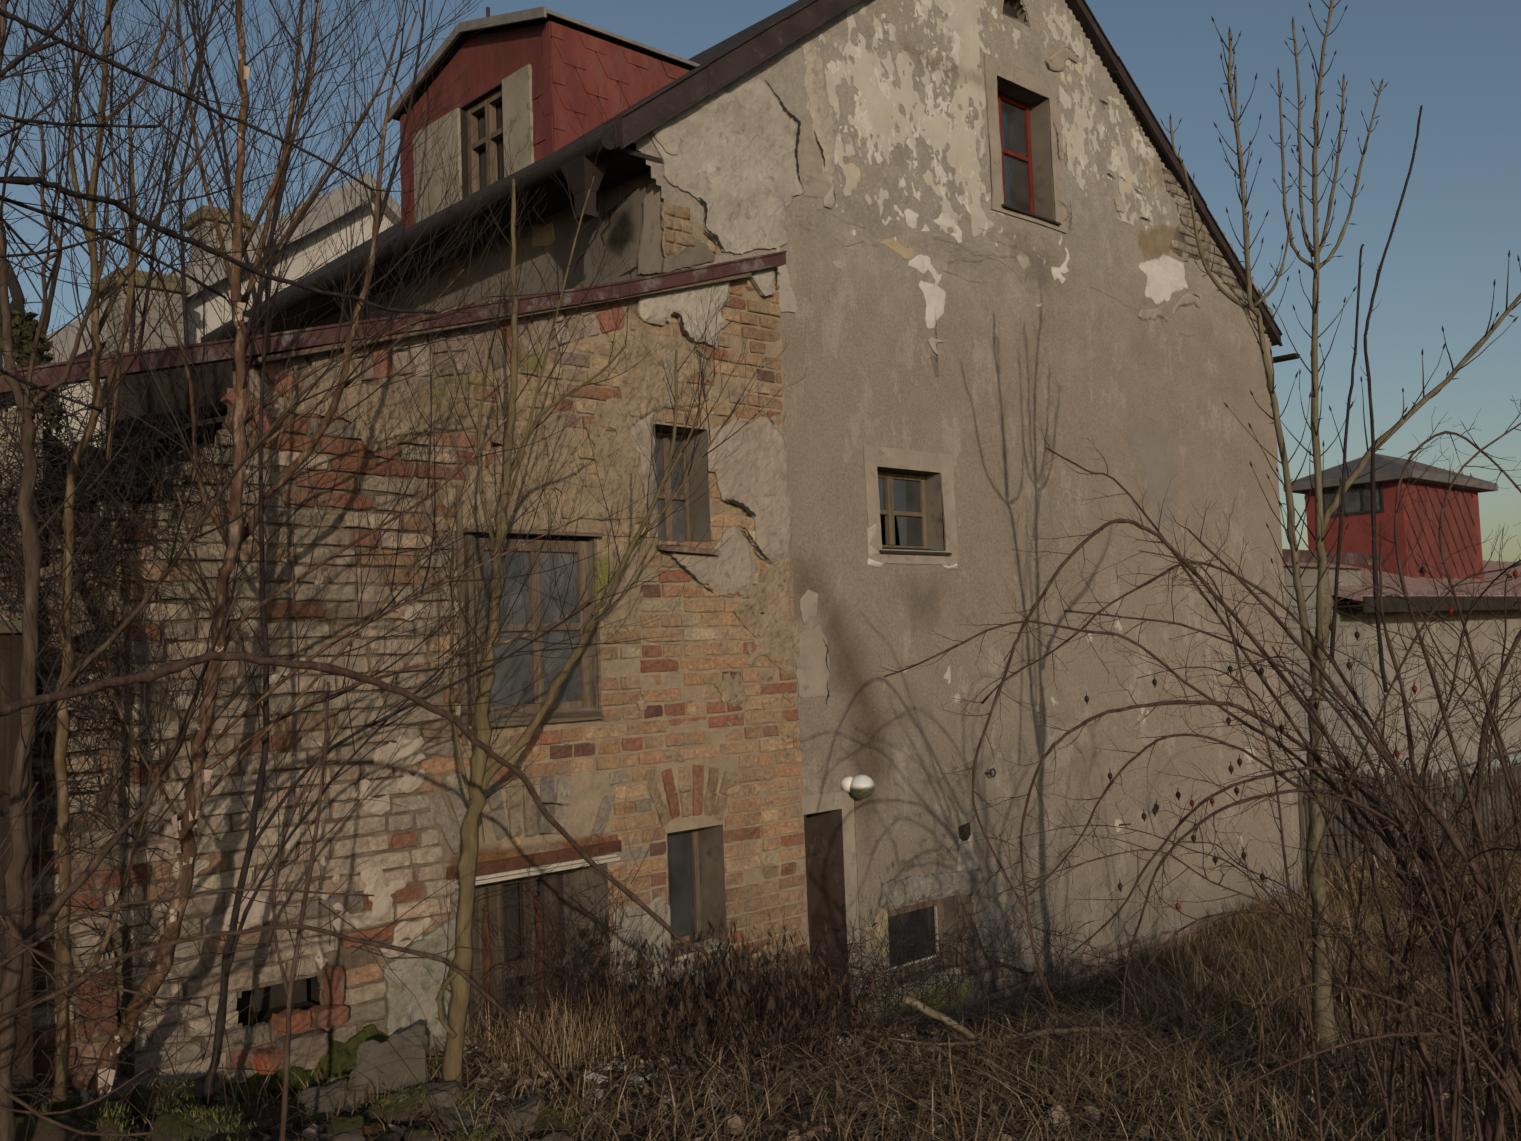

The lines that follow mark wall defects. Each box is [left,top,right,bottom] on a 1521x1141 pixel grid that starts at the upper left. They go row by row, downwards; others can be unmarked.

crack [765,80,836,202]
flaking render [637,0,1070,355]
peeling [1032,0,1275,332]
crack [698,197,726,252]
flaking render [630,410,793,595]
peeling [599,548,644,643]
peeling [174,685,202,713]
peeling [356,736,426,815]
peeling [173,859,210,879]
peeling [256,828,297,849]
peeling [214,891,273,936]
peeling [380,917,433,953]